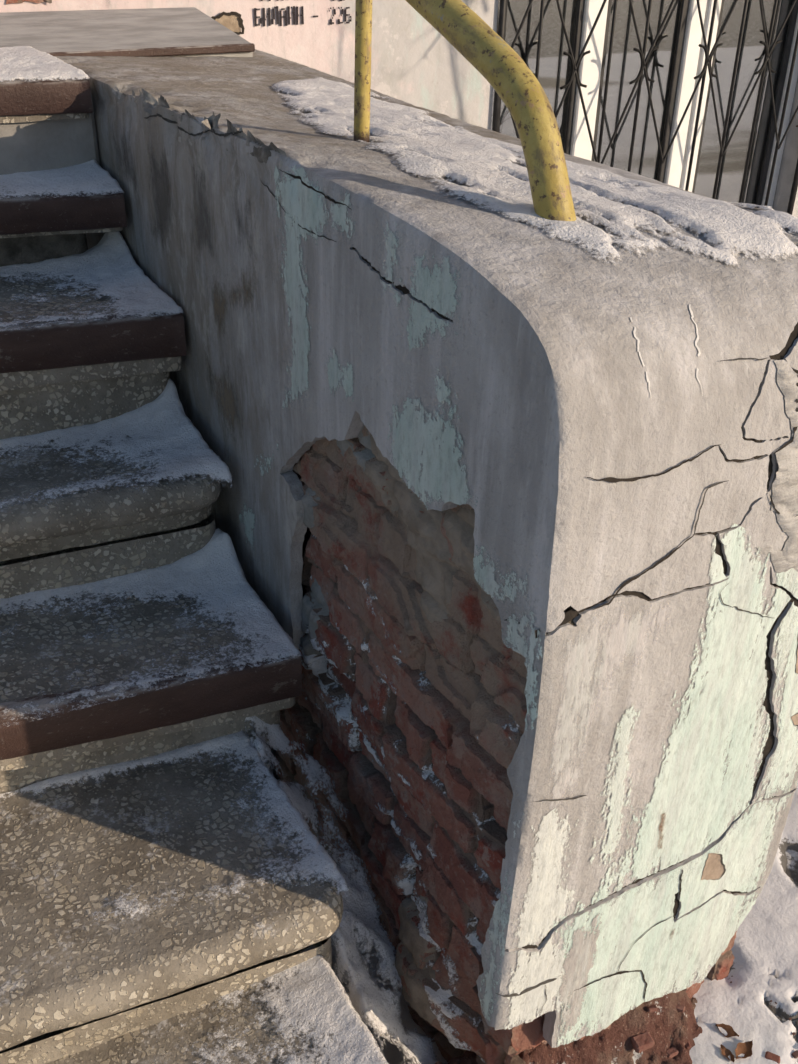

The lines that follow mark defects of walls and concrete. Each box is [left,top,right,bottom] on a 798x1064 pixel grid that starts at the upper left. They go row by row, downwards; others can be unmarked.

crack [261,169,453,322]
peeling [381,223,461,351]
crack [504,322,798,802]
spalling [275,373,798,1064]
crack [496,842,713,1017]